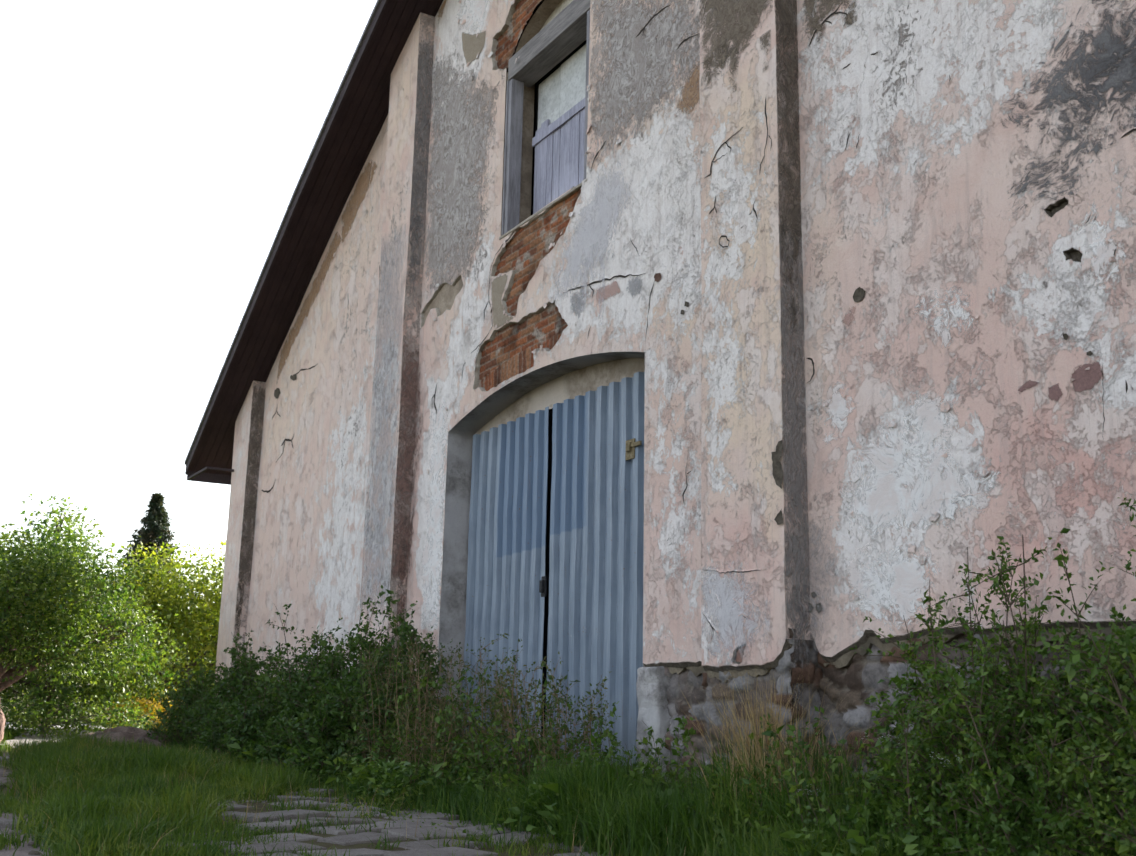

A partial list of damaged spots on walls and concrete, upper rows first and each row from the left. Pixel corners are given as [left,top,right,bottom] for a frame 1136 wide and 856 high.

peeling [419,0,542,330]
flaking render [471,186,642,391]
crack [562,237,656,342]
crack [704,94,772,250]
flaking render [1044,197,1069,218]
mould [1002,0,1136,208]
peeling [1063,203,1126,287]
crack [1121,127,1136,138]
peeling [1018,362,1103,401]
crack [261,404,294,493]
flaking render [643,639,797,683]